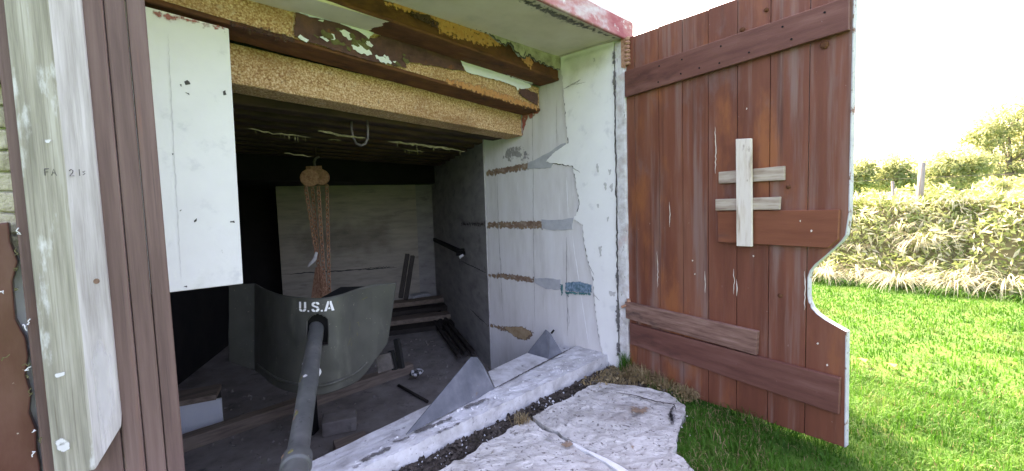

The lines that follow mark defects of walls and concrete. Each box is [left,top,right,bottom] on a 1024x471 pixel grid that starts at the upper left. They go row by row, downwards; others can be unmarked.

peeling [298,12,409,66]
spalling [476,29,561,70]
peeling [461,61,533,90]
spalling [486,143,566,176]
spalling [461,218,573,230]